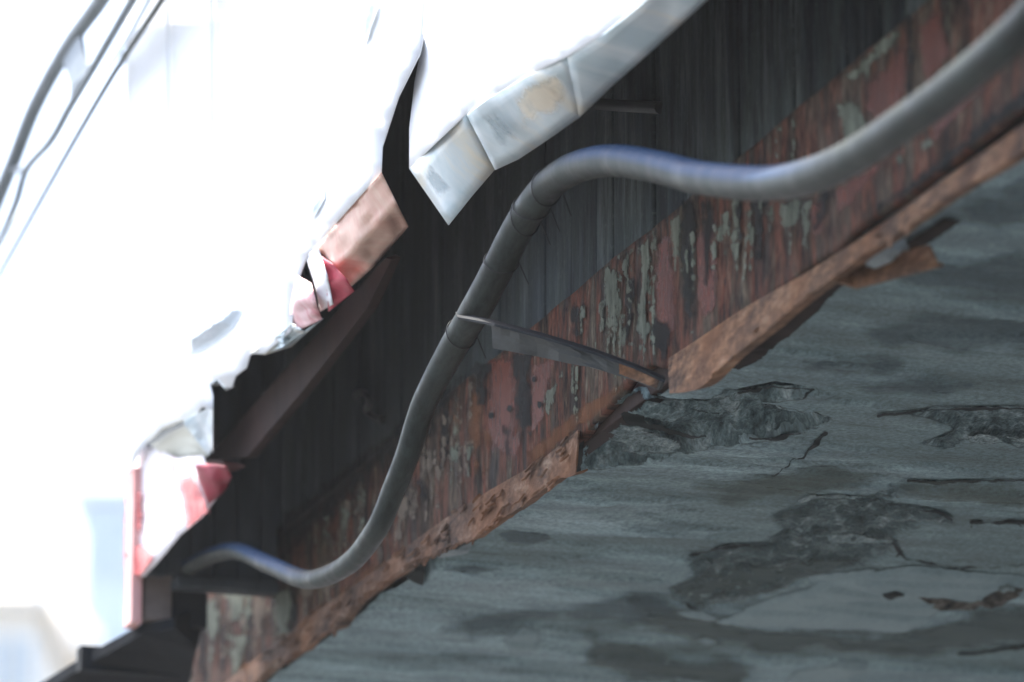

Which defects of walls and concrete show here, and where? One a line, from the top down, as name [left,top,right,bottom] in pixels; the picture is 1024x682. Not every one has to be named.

peeling [846,31,900,80]
peeling [835,102,866,141]
peeling [580,230,657,361]
peeling [670,214,696,291]
peeling [710,198,812,281]
corrosion [834,244,944,289]
spalling [576,375,829,472]
crack [772,431,828,477]
spalling [877,405,1024,449]
spalling [671,489,1024,633]